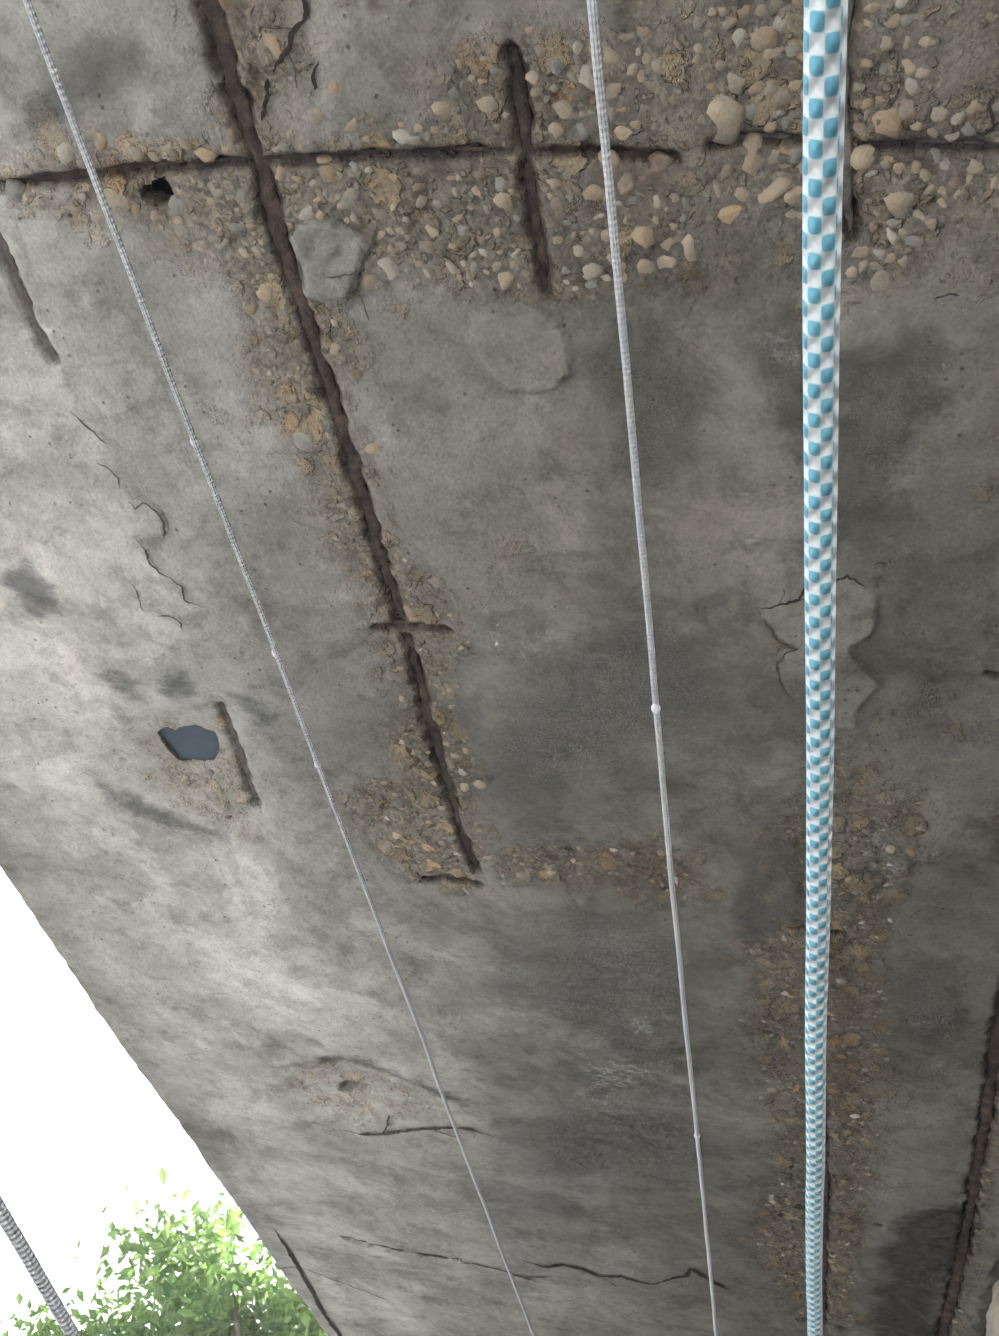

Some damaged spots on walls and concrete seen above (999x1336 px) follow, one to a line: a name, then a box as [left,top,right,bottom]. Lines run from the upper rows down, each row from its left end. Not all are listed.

spalling [0,85,126,377]
crack [259,0,319,121]
spalling [840,0,999,332]
crack [70,410,203,631]
damp [747,323,803,430]
damp [837,346,938,542]
spalling [65,0,807,1336]
spalling [822,574,965,1336]
crack [221,1231,389,1336]
crack [457,1259,731,1291]